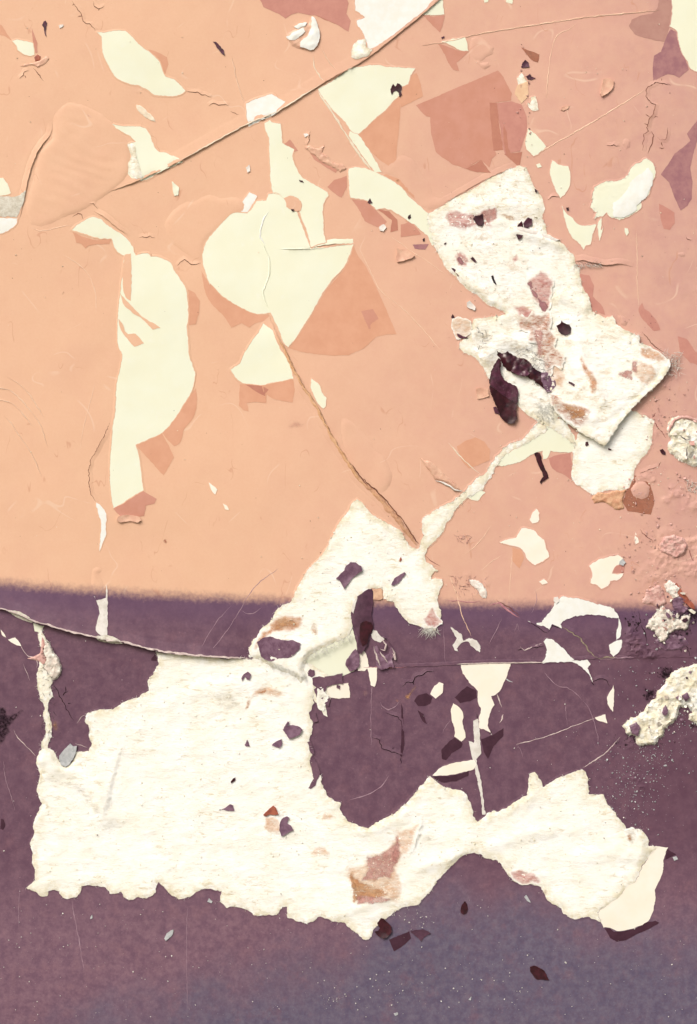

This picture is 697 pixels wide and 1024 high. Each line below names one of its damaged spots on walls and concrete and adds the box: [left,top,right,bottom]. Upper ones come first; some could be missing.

peeling [96,29,187,98]
crack [186,88,238,115]
peeling [201,63,446,386]
peeling [516,128,604,251]
peeling [70,215,197,552]
peeling [476,348,556,424]
crack [353,466,418,543]
peeling [336,562,362,589]
peeling [257,589,396,699]
peeling [527,595,622,683]
peeling [430,626,512,816]
peeling [598,846,678,931]